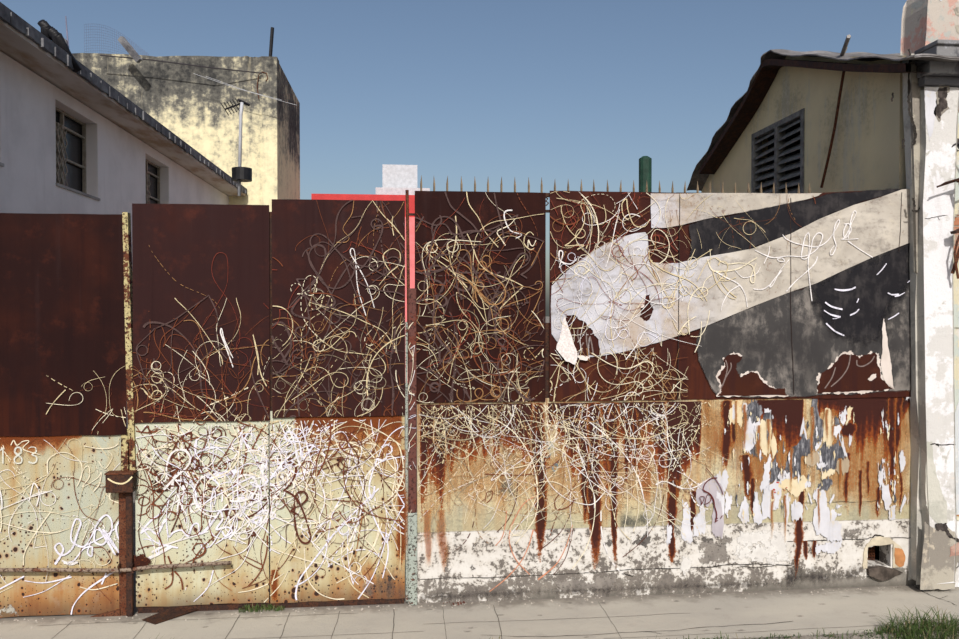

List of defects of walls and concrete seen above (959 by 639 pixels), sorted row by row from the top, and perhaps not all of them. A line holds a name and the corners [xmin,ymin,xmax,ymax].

spalling [924,86,959,142]
peeling [718,354,787,396]
peeling [817,353,893,393]
rust [295,416,408,562]
rust [420,397,910,575]
rust [133,554,151,567]
rust [270,570,278,600]